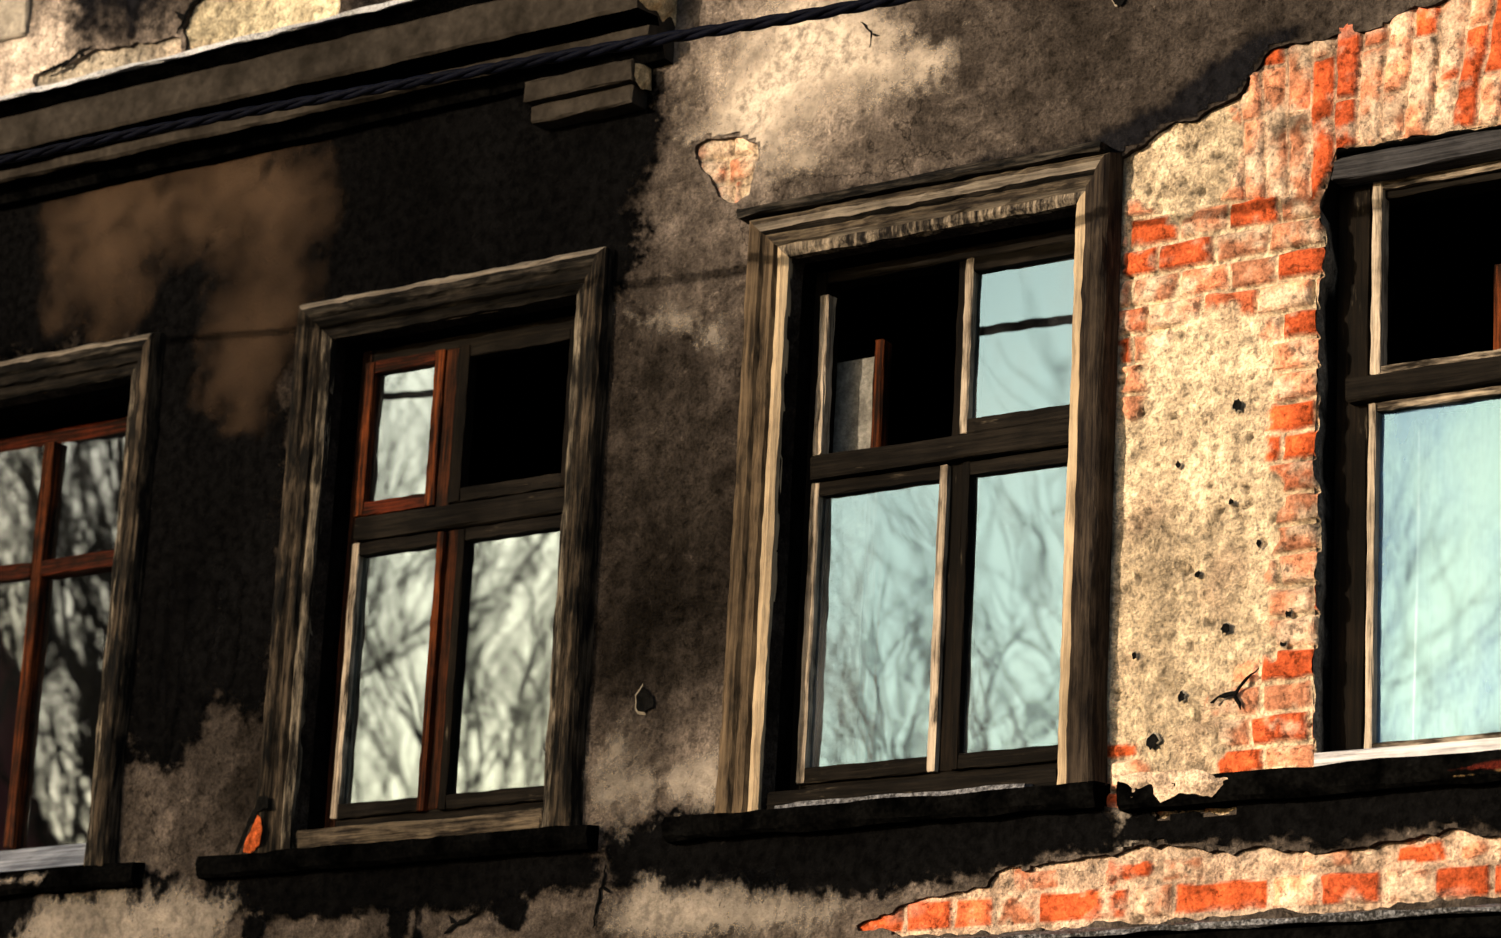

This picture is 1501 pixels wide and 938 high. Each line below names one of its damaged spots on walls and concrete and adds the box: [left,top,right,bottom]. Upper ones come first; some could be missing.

flaking render [37,0,340,86]
damp [686,0,956,171]
flaking render [698,138,759,203]
flaking render [1107,0,1501,819]
crack [1210,668,1259,710]
flaking render [860,829,1501,936]